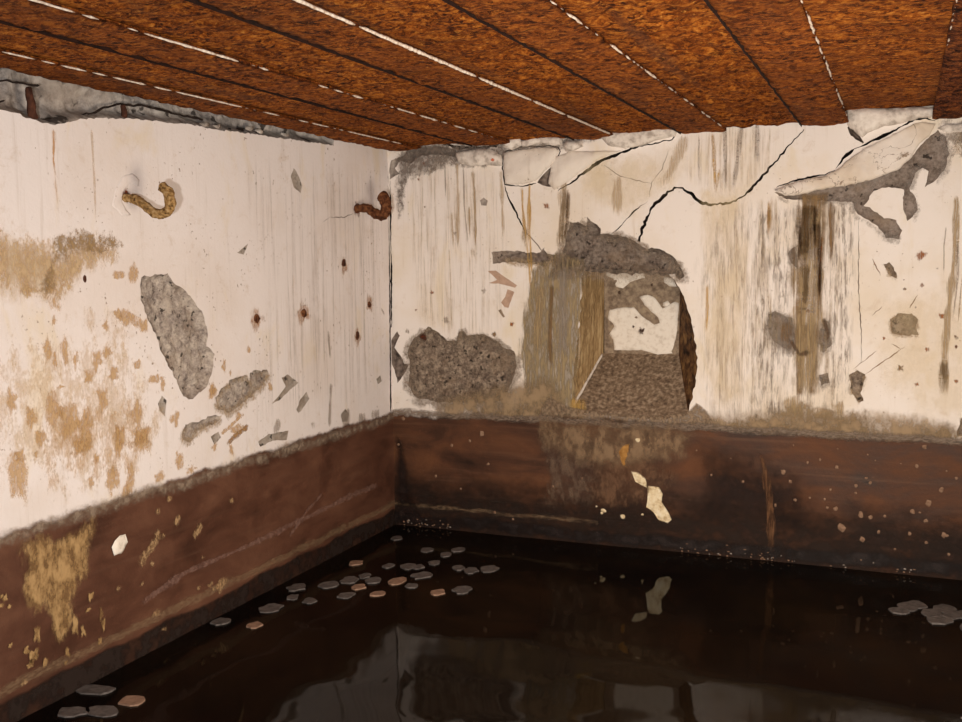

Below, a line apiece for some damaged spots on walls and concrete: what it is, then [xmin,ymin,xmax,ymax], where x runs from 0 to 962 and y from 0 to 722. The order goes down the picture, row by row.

spalling [0,68,334,146]
leakage [610,44,743,183]
leakage [445,164,477,242]
crack [444,144,561,251]
crack [559,118,935,242]
spalling [775,130,962,239]
spalling [488,217,686,317]
spalling [140,273,215,399]
spalling [182,370,270,445]
peeling [271,374,298,404]
spalling [391,327,521,409]
leakage [0,184,962,722]